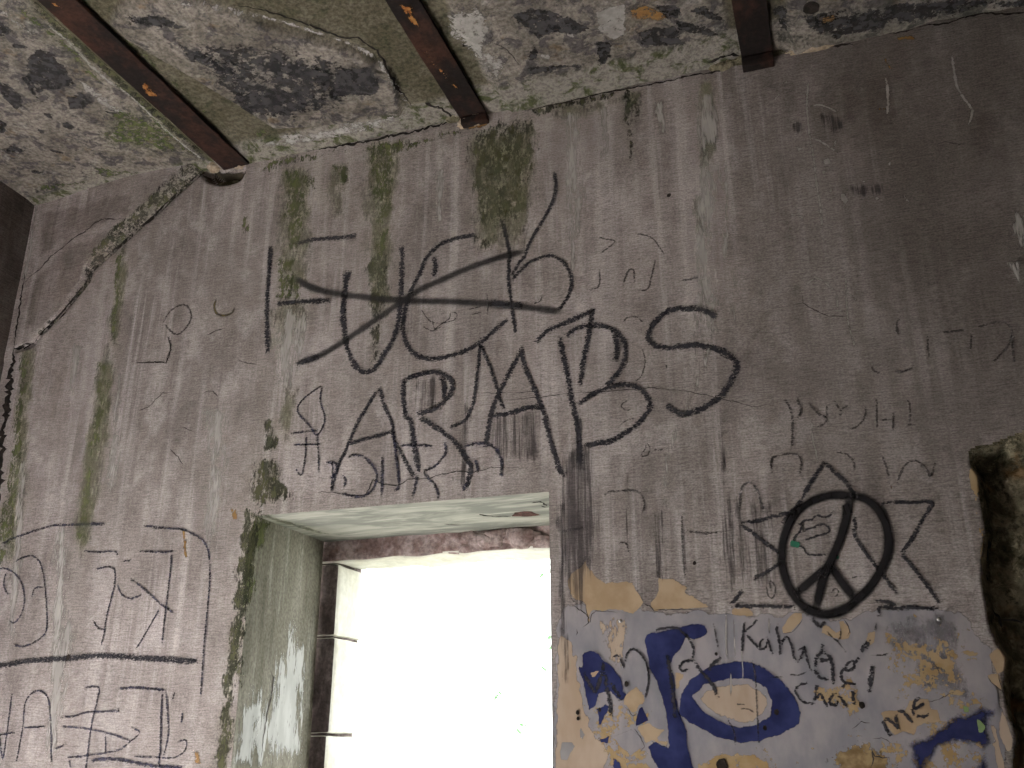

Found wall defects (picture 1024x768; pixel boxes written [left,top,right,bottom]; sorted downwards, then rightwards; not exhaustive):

rust [400,5,419,26]
leakage [466,89,640,275]
crack [0,170,203,501]
leakage [370,325,380,362]
leakage [9,460,26,637]
leakage [46,527,72,758]
leakage [77,361,121,539]
leakage [213,309,306,768]
peeling [552,430,1024,768]